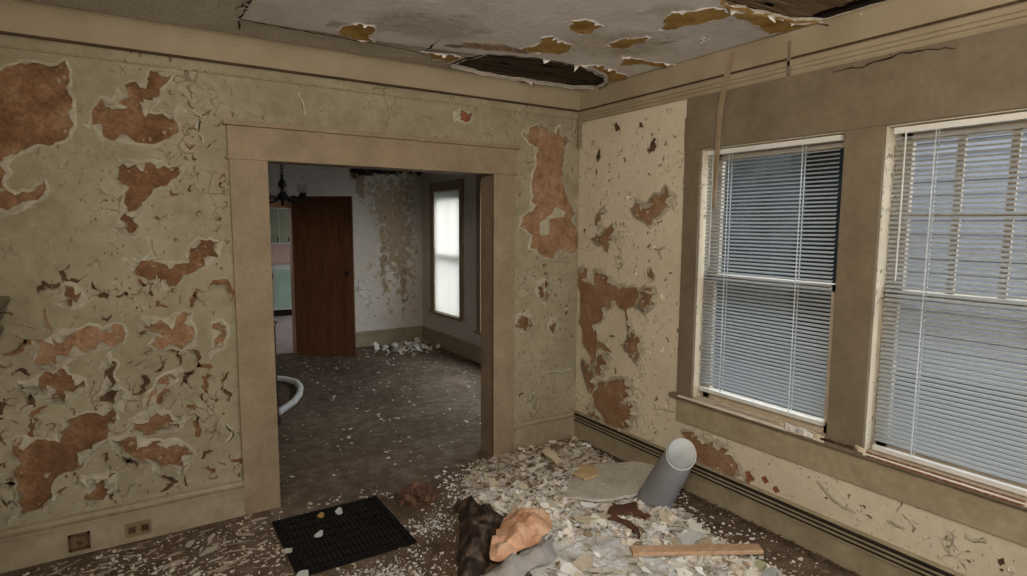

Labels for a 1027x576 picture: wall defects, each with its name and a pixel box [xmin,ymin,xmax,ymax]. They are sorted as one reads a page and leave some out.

peeling [420,0,824,90]
peeling [646,133,684,178]
peeling [0,58,243,526]
peeling [514,121,678,434]
peeling [680,428,793,497]